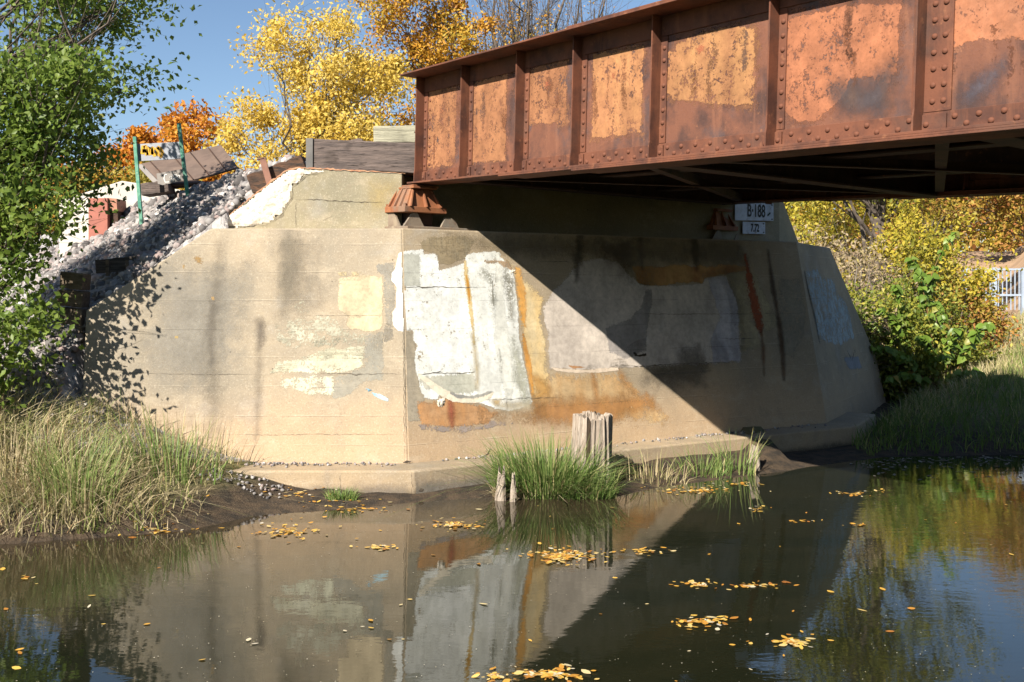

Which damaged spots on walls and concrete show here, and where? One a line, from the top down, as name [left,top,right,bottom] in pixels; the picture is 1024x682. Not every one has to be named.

corrosion [591,58,628,125]
corrosion [740,30,749,72]
corrosion [834,0,859,87]
spalling [228,167,405,228]
peeling [270,235,533,422]
corrosion [417,259,671,434]
corrosion [631,254,765,361]